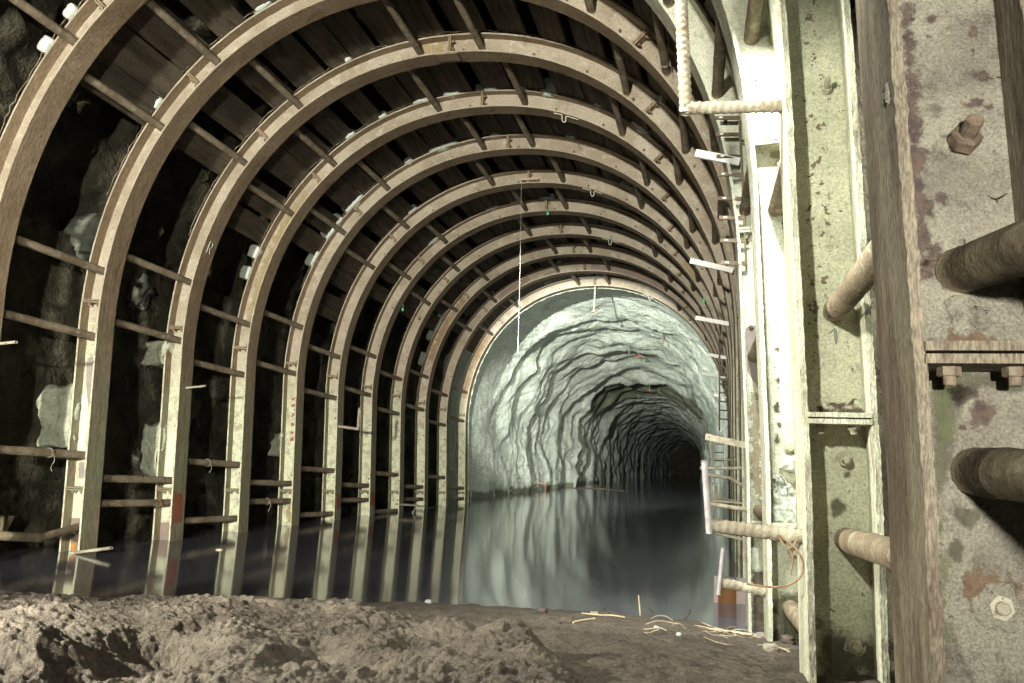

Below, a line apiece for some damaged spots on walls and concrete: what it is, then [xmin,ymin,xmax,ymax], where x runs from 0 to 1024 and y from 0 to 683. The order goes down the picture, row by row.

corrosion [964,98,993,109]
corrosion [900,3,948,278]
corrosion [963,569,1023,613]